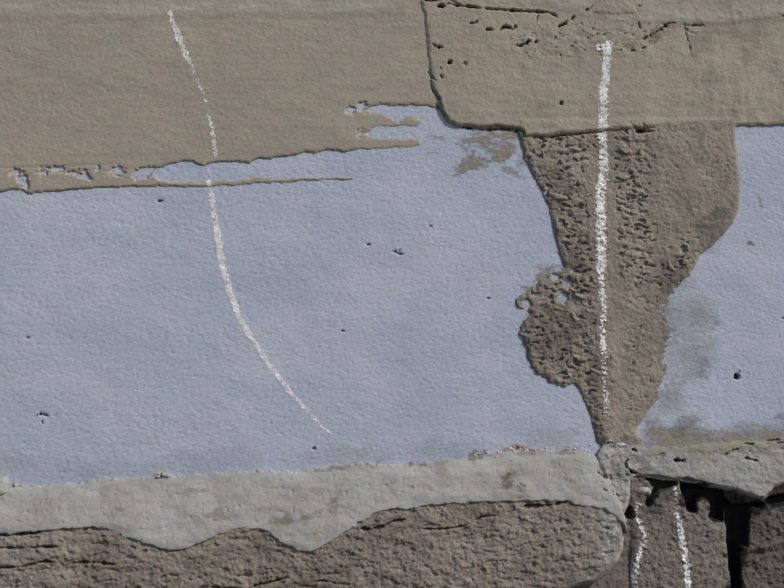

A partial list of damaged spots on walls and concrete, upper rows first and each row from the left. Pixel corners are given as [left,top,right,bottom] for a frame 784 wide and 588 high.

crack [424,0,589,47]
crack [522,500,568,508]
crack [361,519,404,531]
crack [427,515,487,530]
crack [0,531,58,569]
crack [77,558,113,566]
crack [200,577,285,588]